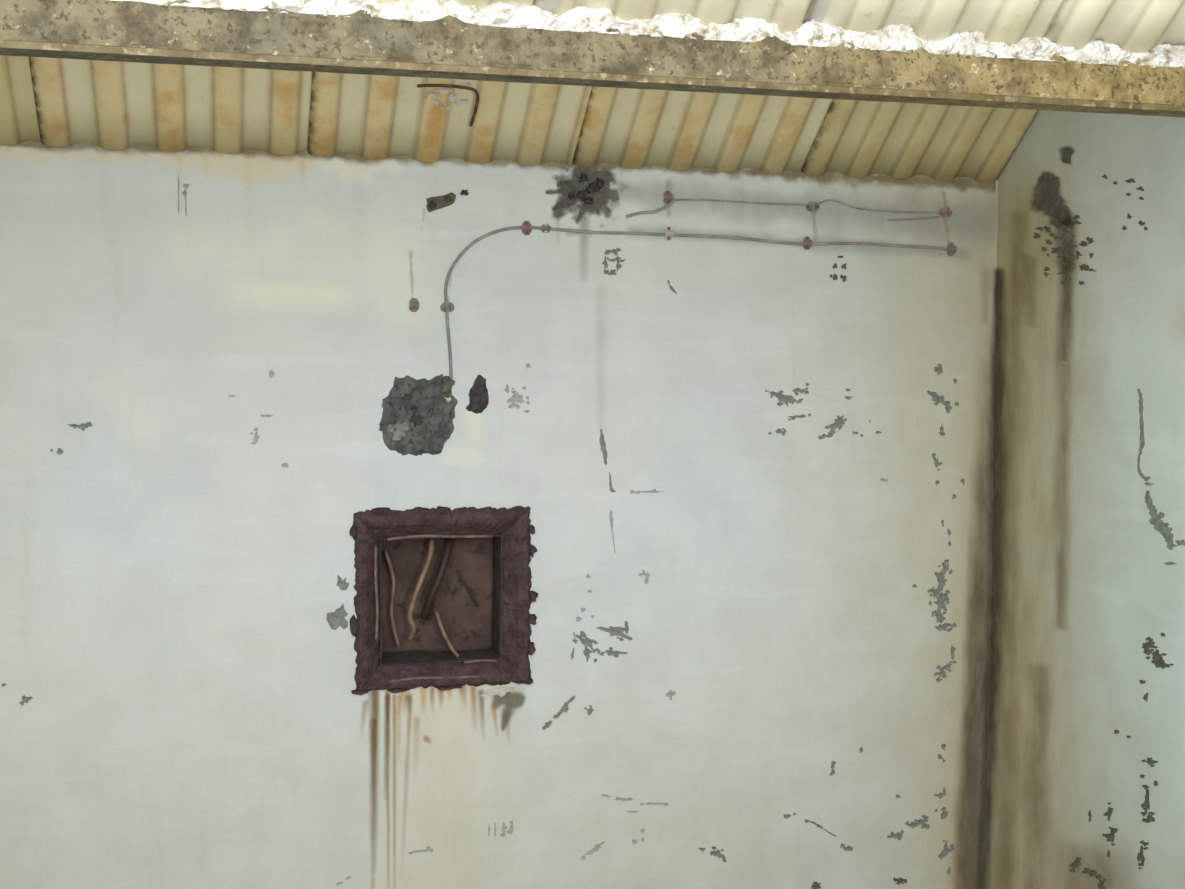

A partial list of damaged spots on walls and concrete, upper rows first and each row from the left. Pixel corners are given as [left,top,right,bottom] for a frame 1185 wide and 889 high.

spalling [379,374,489,456]
peeling [765,383,811,435]
peeling [818,415,882,439]
peeling [927,391,959,436]
crack [1137,389,1185,565]
leakage [912,143,1185,889]
peeling [912,520,957,632]
peeling [571,608,633,663]
rust [339,683,540,889]
peeling [1140,757,1158,823]
peeling [1088,802,1118,857]
peeling [1137,840,1149,869]